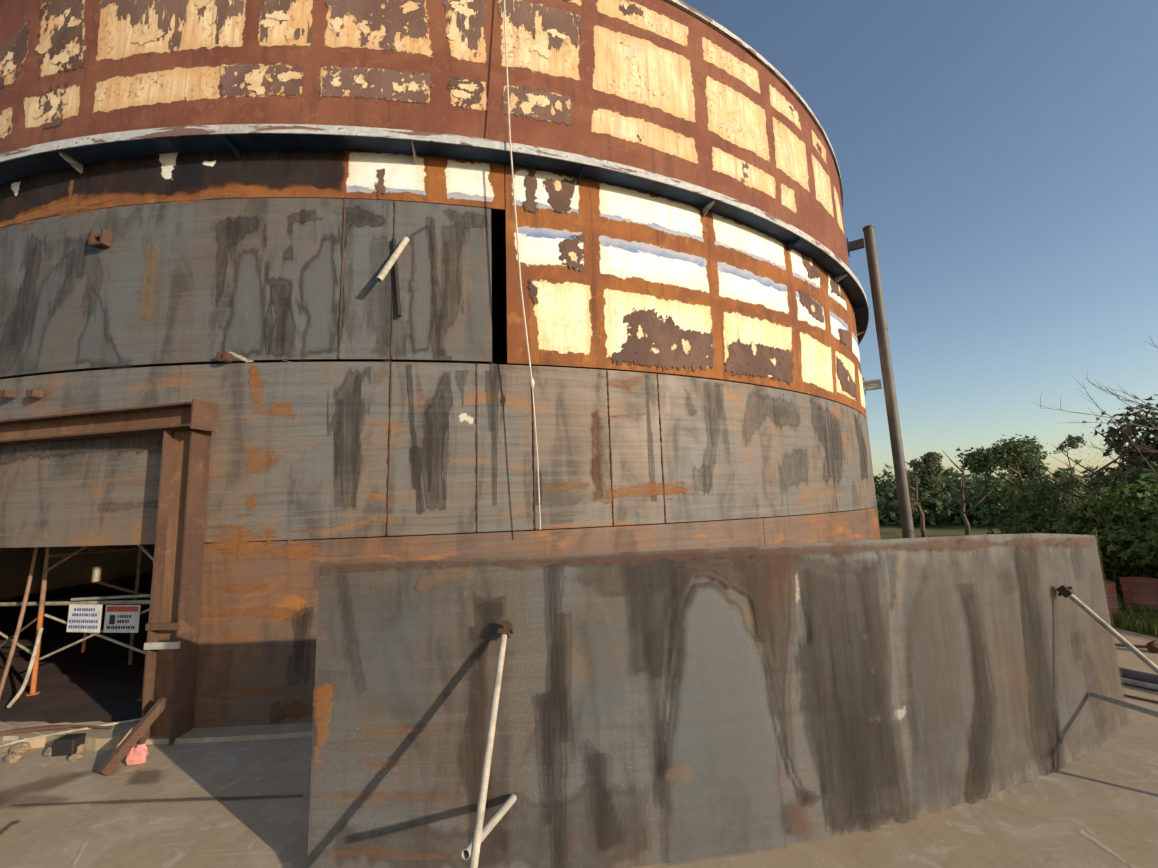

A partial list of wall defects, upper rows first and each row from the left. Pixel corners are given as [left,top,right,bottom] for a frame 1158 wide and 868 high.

peeling [100,0,244,52]
peeling [325,0,431,53]
peeling [443,0,583,58]
peeling [523,167,575,213]
peeling [609,308,795,386]
corrosion [247,366,295,419]
leakage [406,364,449,512]
leakage [645,373,657,501]
corrosion [211,494,319,561]
corrosion [313,685,333,762]
leakage [536,563,572,868]
leakage [662,551,911,832]